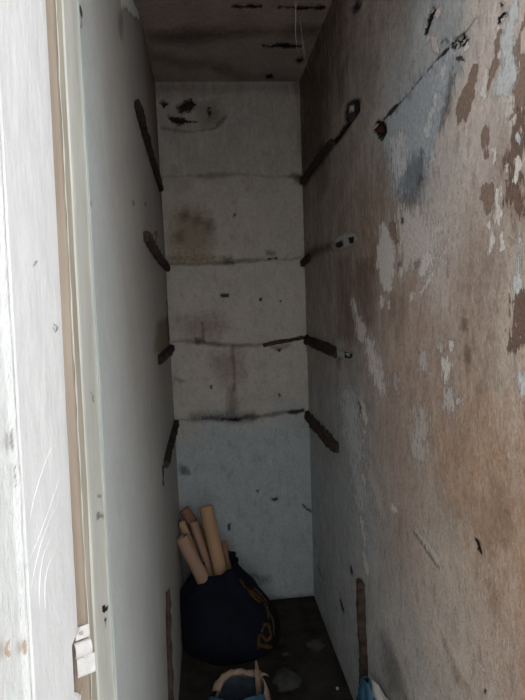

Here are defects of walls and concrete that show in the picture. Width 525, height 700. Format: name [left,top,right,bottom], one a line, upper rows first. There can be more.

spalling [425,4,444,54]
flaking render [160,98,198,127]
spalling [372,120,387,141]
crack [384,46,454,120]
water stain [382,41,464,203]
peeling [452,0,525,255]
peeling [374,198,453,310]
peeling [506,236,525,355]
peeling [436,339,464,420]
peeling [515,370,525,398]